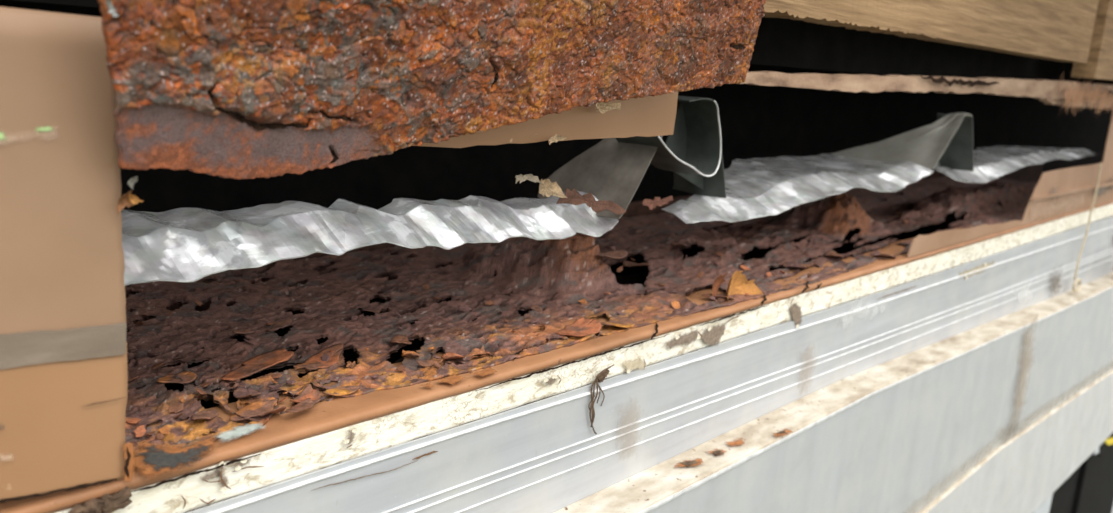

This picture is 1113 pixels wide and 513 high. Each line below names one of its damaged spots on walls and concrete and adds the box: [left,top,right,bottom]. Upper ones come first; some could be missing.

rust [515,174,626,215]
rust [642,195,673,210]
spalling [615,273,650,295]
rust [701,270,764,301]
peeling [790,298,802,328]
peeling [667,315,740,349]
rust [157,371,197,384]
rust [192,343,360,422]
rust [390,335,465,367]
peeling [623,355,646,373]
peeling [344,428,358,448]
rust [675,438,744,467]